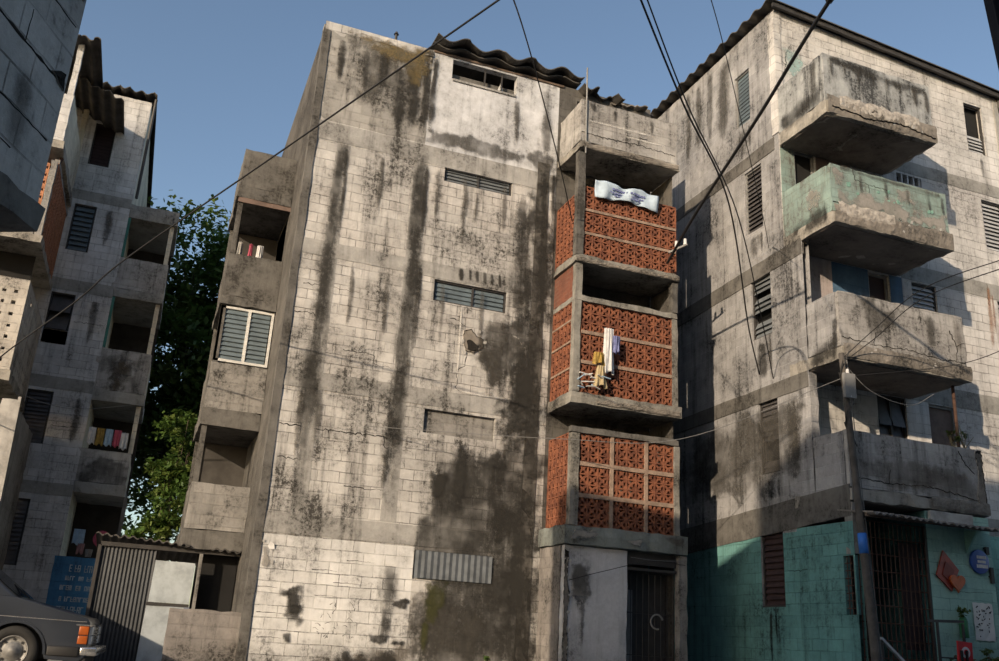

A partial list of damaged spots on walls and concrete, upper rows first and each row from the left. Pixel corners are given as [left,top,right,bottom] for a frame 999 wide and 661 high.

water stain [337,45,345,76]
water stain [363,53,438,124]
mould [829,57,873,82]
mould [886,79,929,112]
spalling [827,94,938,144]
spalling [832,167,954,250]
water stain [297,148,347,426]
spalling [460,329,487,355]
crack [842,331,965,364]
water stain [370,164,561,661]
crack [859,470,980,501]
water stain [281,585,302,623]